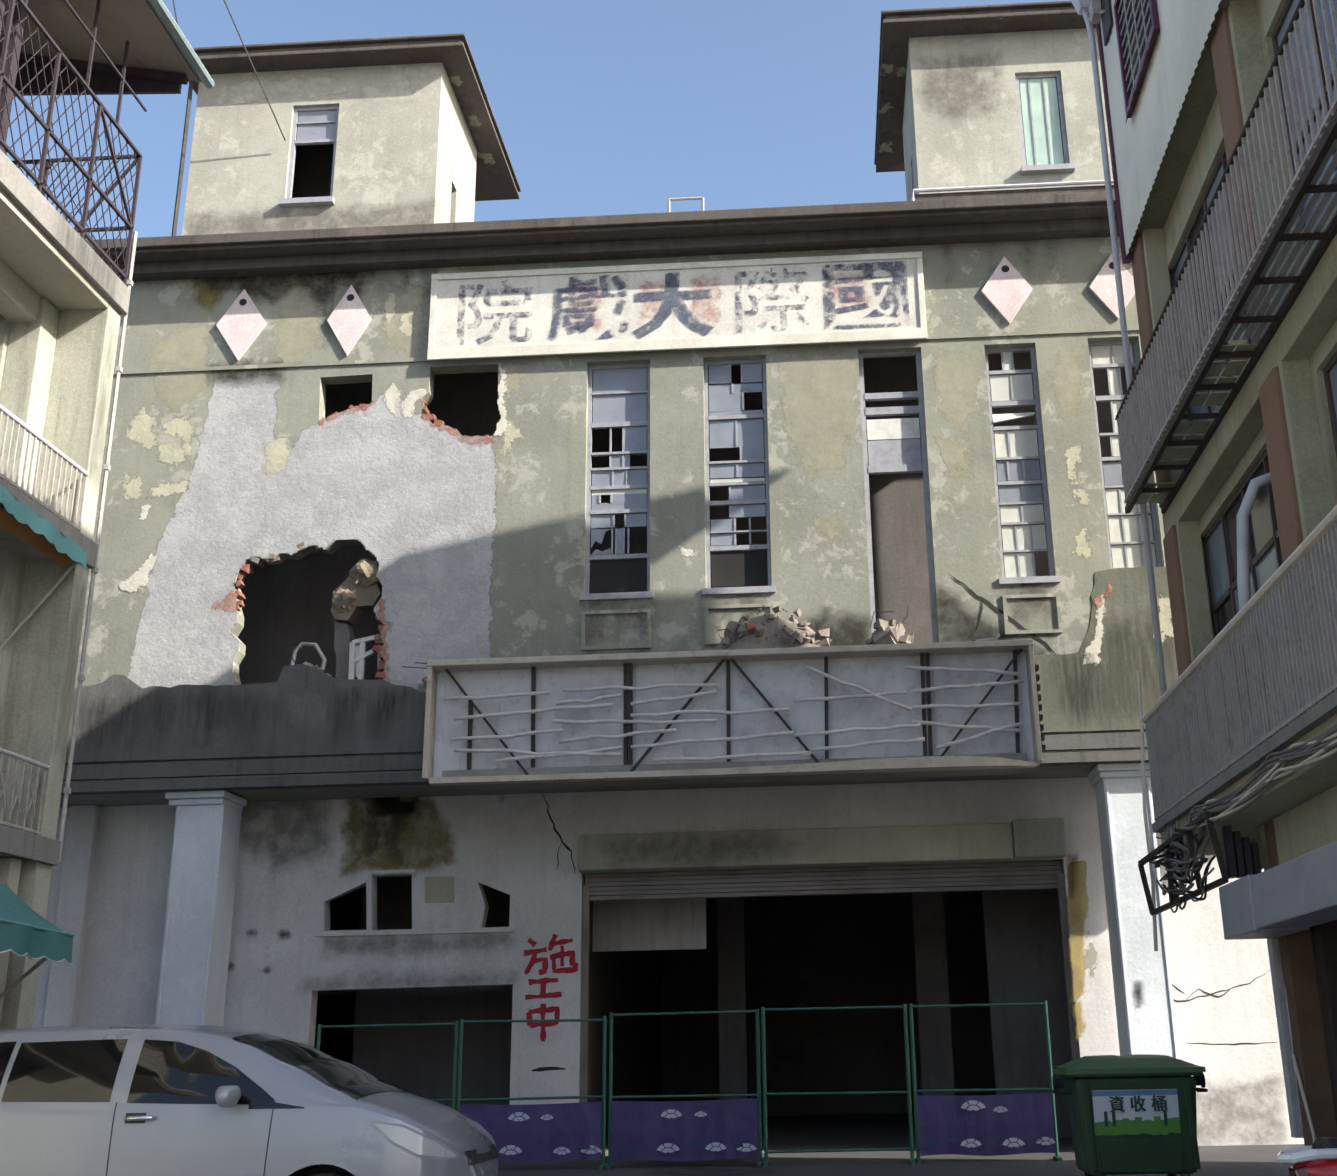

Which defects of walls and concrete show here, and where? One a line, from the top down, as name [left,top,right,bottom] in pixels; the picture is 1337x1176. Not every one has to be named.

spalling [118,280,528,690]
peeling [1064,444,1091,509]
peeling [1072,527,1094,558]
crack [949,574,1056,654]
spalling [1083,584,1113,665]
crack [542,794,575,874]
crack [1172,970,1270,1002]